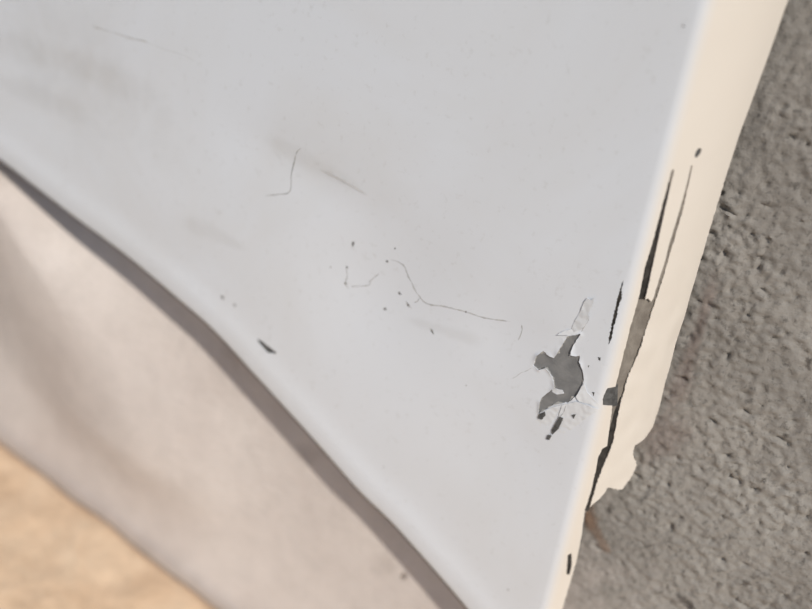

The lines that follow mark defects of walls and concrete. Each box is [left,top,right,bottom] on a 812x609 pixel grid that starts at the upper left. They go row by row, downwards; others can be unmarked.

peeling [534,148,728,513]